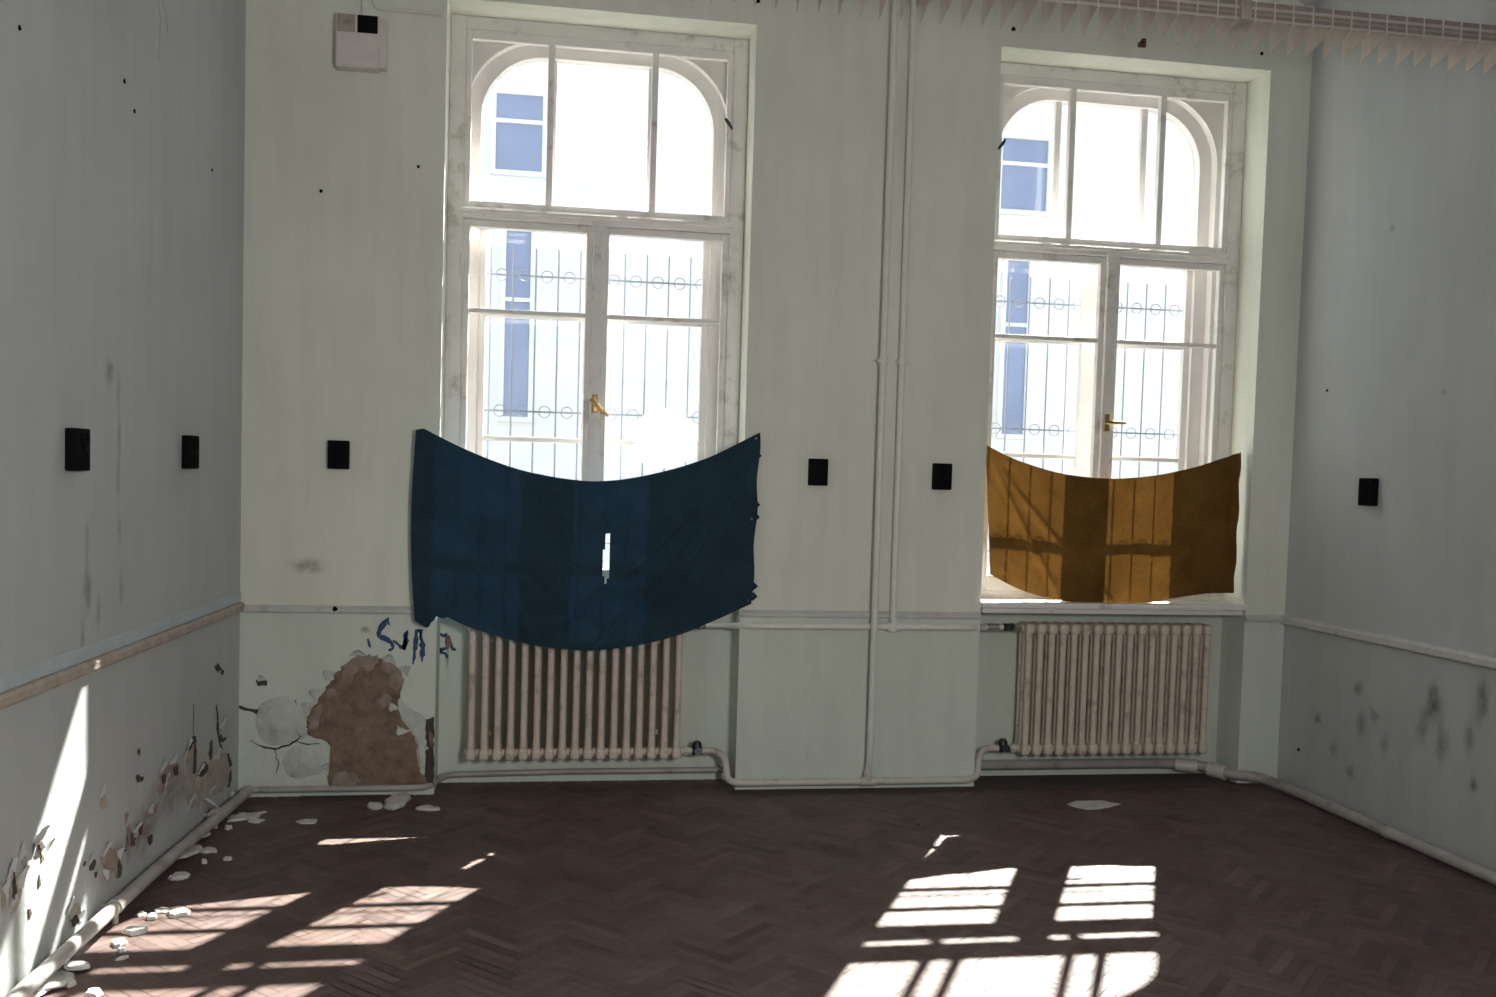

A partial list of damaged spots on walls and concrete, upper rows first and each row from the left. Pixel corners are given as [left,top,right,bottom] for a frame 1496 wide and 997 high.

flaking render [297,650,435,786]
peeling [83,704,233,880]
peeling [0,825,56,920]
peeling [68,896,85,929]
flaking render [37,960,90,990]